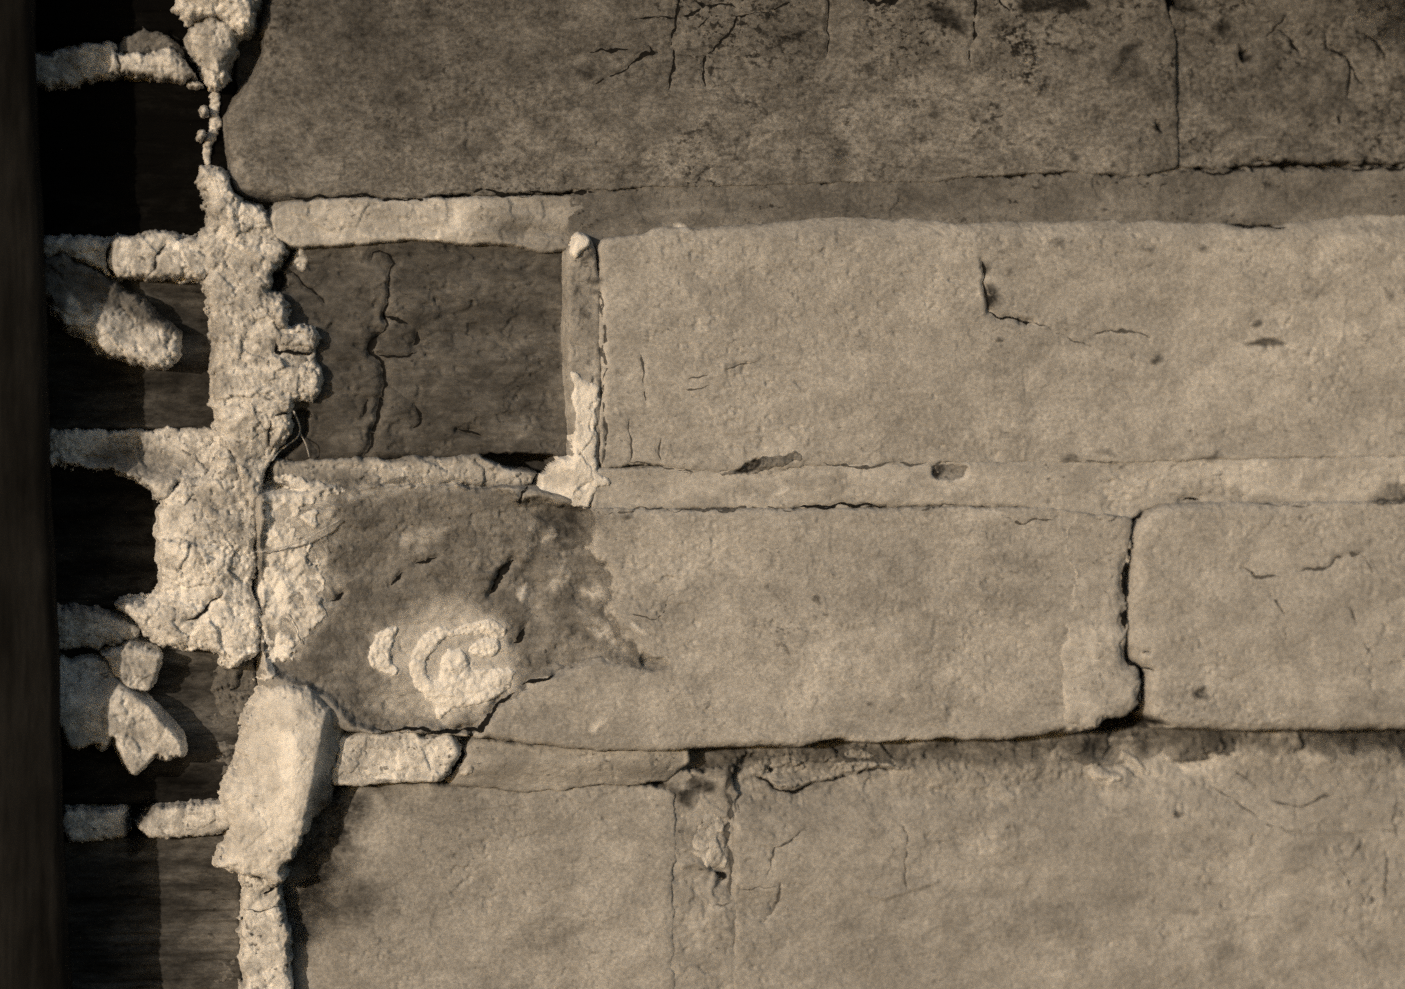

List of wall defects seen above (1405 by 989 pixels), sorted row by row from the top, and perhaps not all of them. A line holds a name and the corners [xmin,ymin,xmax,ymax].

crack [590,0,789,90]
crack [824,0,832,55]
crack [863,0,898,8]
crack [968,0,1009,63]
crack [981,260,1149,347]
crack [362,250,422,454]
crack [714,762,888,921]
crack [903,827,917,889]